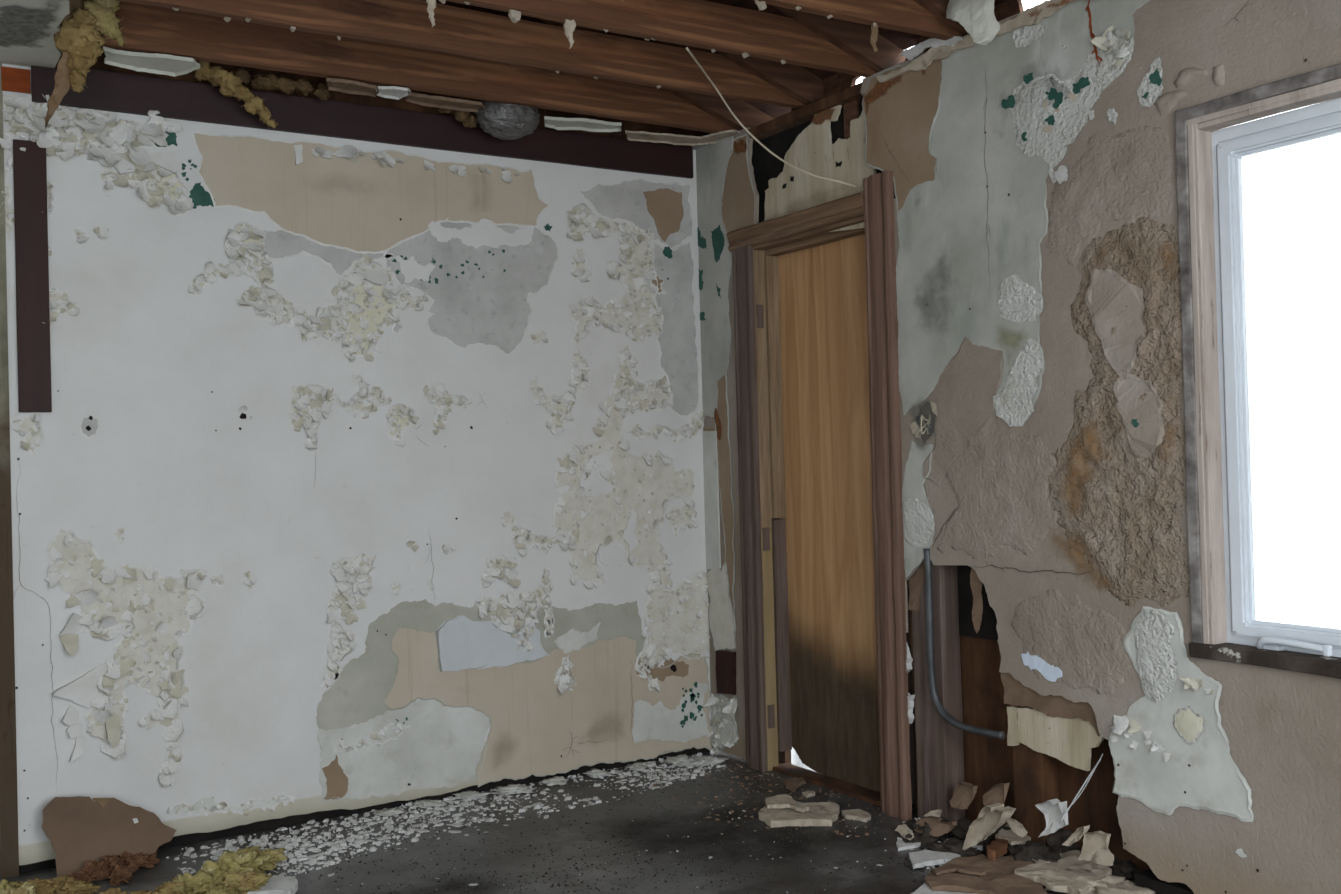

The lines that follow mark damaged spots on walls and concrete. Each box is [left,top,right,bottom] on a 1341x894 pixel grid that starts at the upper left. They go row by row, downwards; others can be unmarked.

peeling [1091,26,1134,68]
peeling [0,94,739,803]
flaking render [923,336,1004,486]
hole [957,565,998,641]
peeling [1110,715,1172,762]
peeling [168,792,297,817]